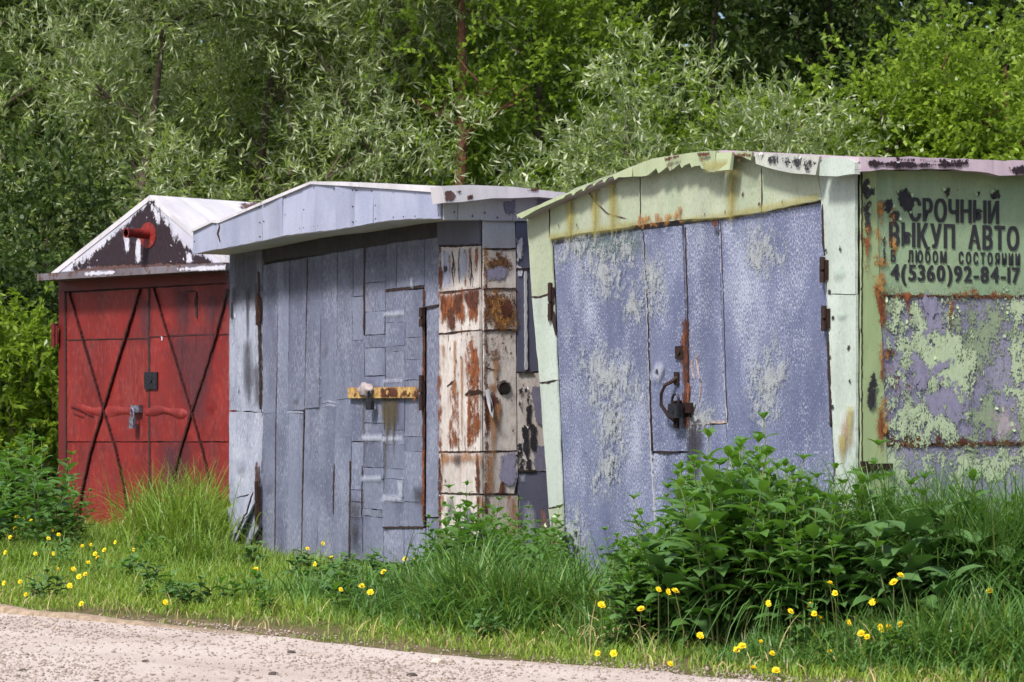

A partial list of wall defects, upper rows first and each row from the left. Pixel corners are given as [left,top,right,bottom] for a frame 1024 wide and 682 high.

peeling [758,152,811,171]
peeling [866,157,969,169]
peeling [71,201,226,277]
rust [595,207,682,230]
rust [862,201,1020,329]
rust [380,246,519,544]
peeling [498,384,546,486]
rust [680,319,698,428]
peeling [865,284,1024,506]